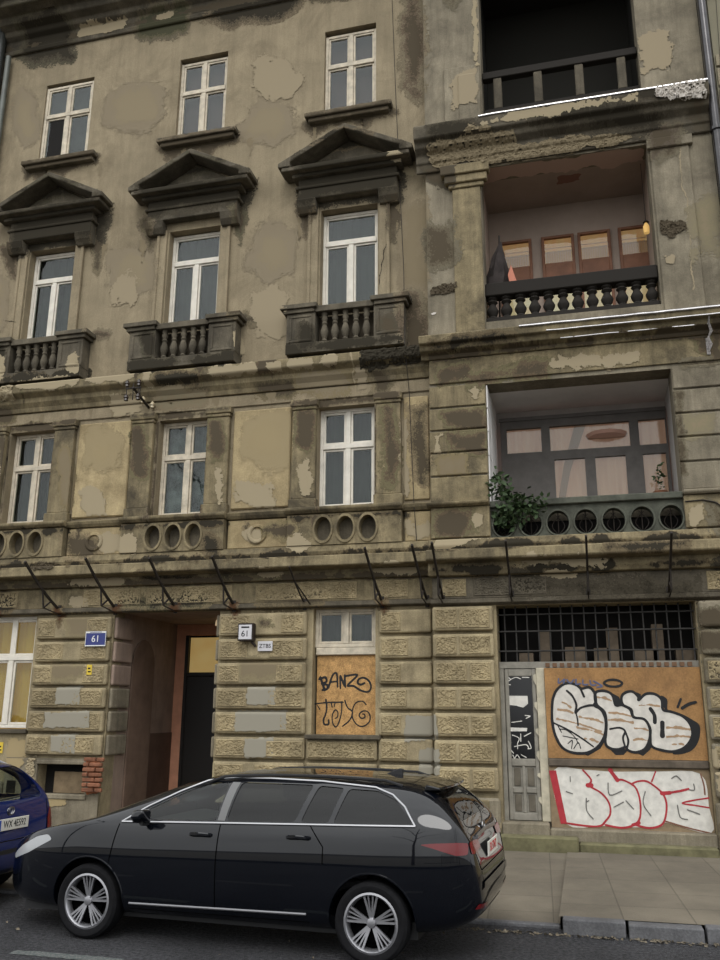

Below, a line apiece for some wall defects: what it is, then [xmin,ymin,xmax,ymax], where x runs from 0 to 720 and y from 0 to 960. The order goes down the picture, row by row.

flaking render [77,15,128,37]
flaking render [637,28,675,75]
flaking render [655,78,707,101]
flaking render [424,92,644,184]
flaking render [660,219,687,238]
damp [0,0,720,626]
flaking render [549,351,640,372]
flaking render [214,467,277,511]
damp [62,611,99,641]
damp [696,607,720,683]
damp [49,659,92,687]
damp [237,653,287,683]